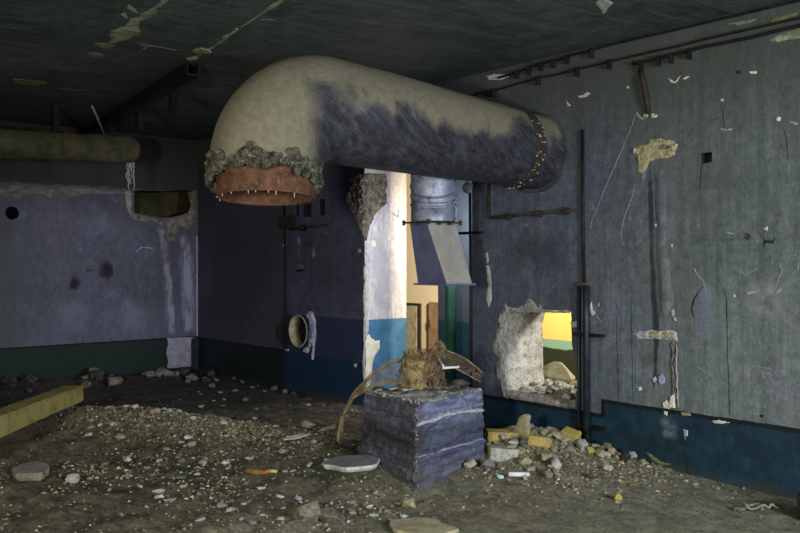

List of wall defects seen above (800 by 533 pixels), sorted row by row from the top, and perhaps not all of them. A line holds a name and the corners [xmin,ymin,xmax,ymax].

peeling [87,0,168,57]
spalling [633,138,678,177]
spalling [0,185,197,241]
spalling [346,173,484,443]
spalling [493,299,577,399]
spalling [634,309,691,416]